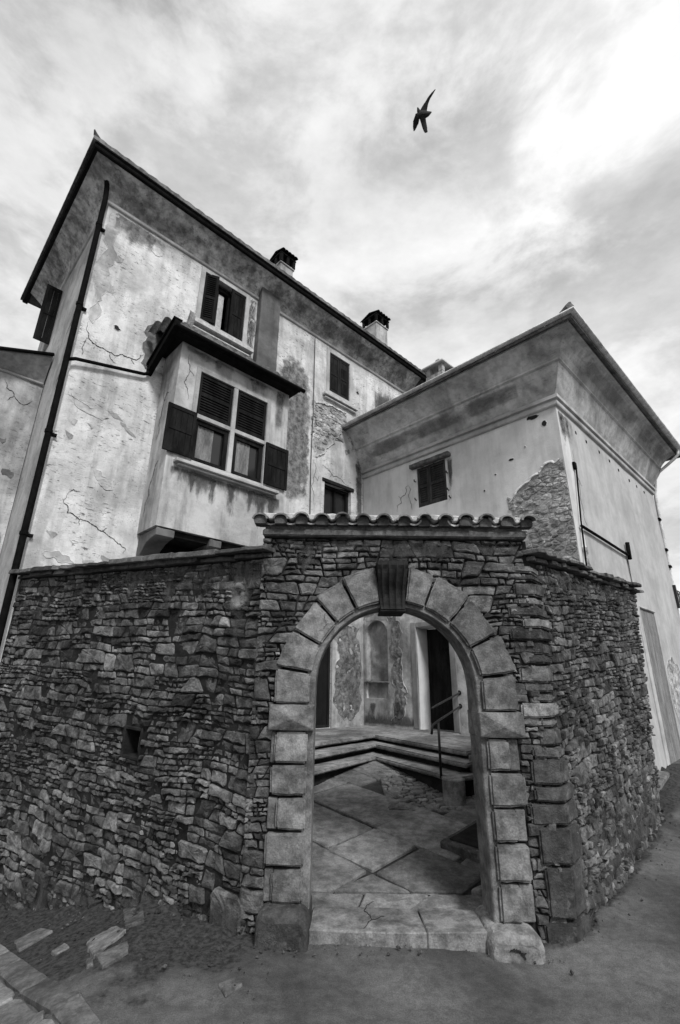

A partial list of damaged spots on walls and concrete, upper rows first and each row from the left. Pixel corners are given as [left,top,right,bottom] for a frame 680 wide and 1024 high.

crack [56,311,141,382]
leakage [276,393,284,425]
flaking render [280,358,355,498]
crack [63,490,126,550]
leakage [171,466,279,513]
flaking render [507,458,592,567]